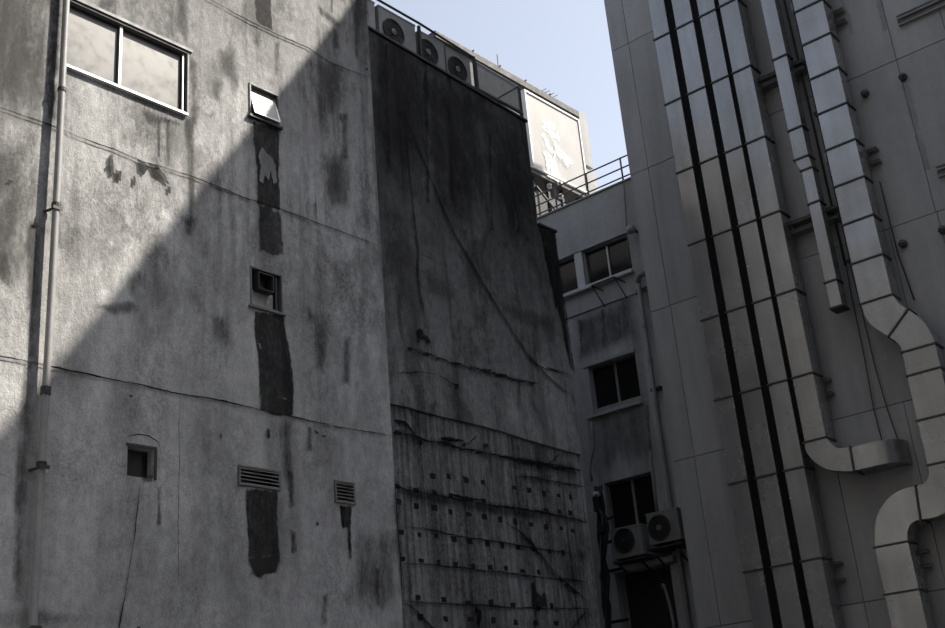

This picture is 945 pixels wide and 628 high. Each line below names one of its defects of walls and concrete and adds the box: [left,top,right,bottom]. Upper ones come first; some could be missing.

leakage [255,0,272,30]
peeling [258,148,277,184]
leakage [0,151,39,369]
crack [400,105,571,394]
leakage [15,381,30,516]
crack [118,482,141,628]
crack [128,434,180,573]
leakage [246,312,294,577]
crack [0,356,585,487]
crack [394,481,589,628]